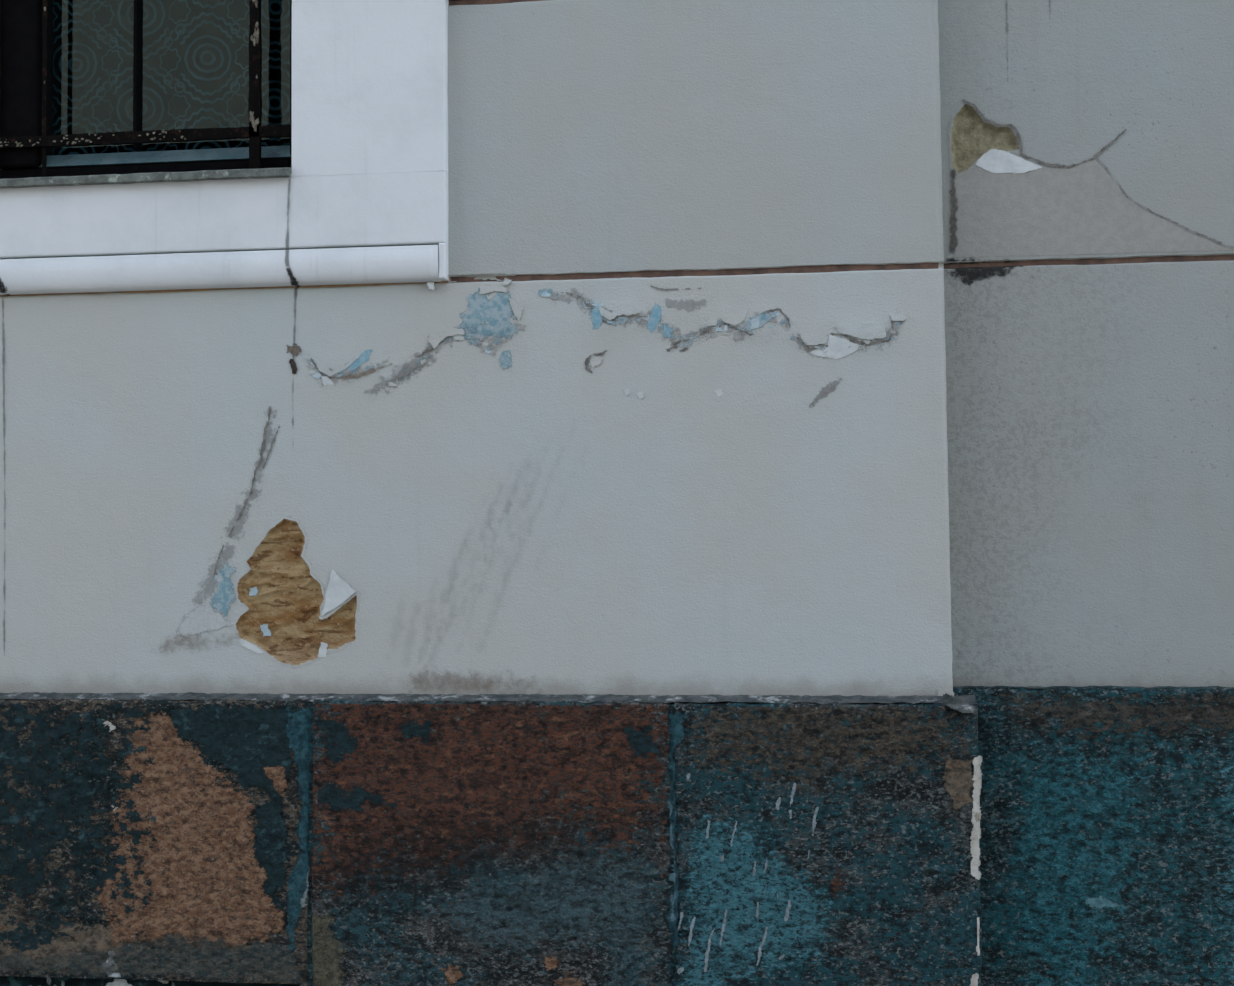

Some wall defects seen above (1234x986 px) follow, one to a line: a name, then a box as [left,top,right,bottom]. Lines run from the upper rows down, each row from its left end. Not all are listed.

peeling [948,99,1234,258]
crack [1020,129,1234,249]
peeling [309,273,526,396]
peeling [538,285,907,359]
crack [176,407,280,638]
flaking render [233,515,360,669]
peeling [0,702,298,986]